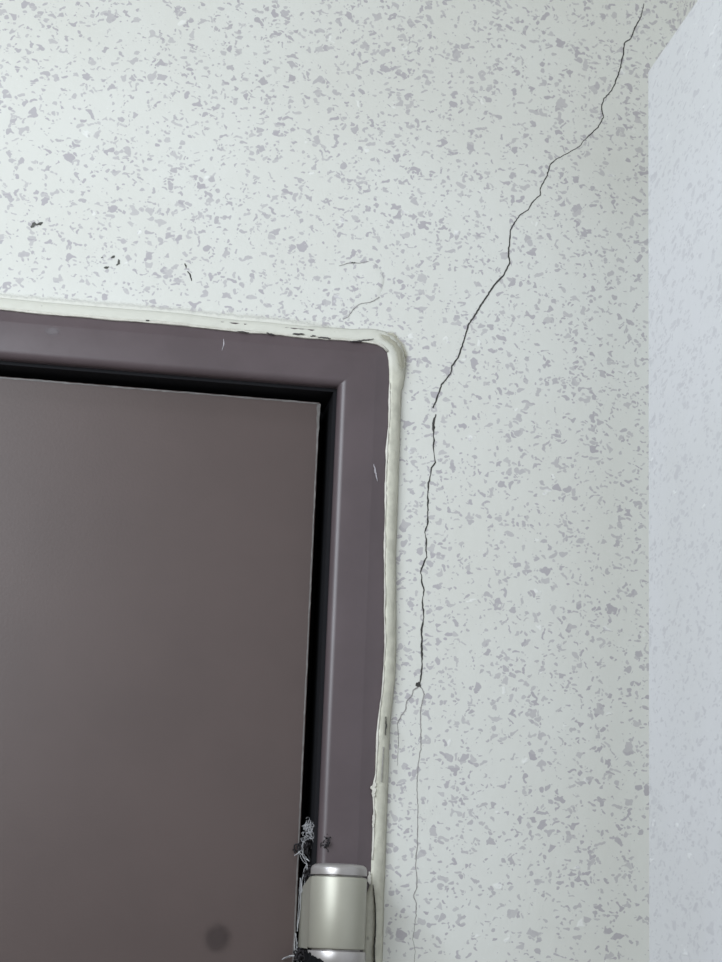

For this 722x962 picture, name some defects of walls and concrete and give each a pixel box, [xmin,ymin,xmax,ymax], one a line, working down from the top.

crack [370,885,378,962]
crack [381,4,644,962]